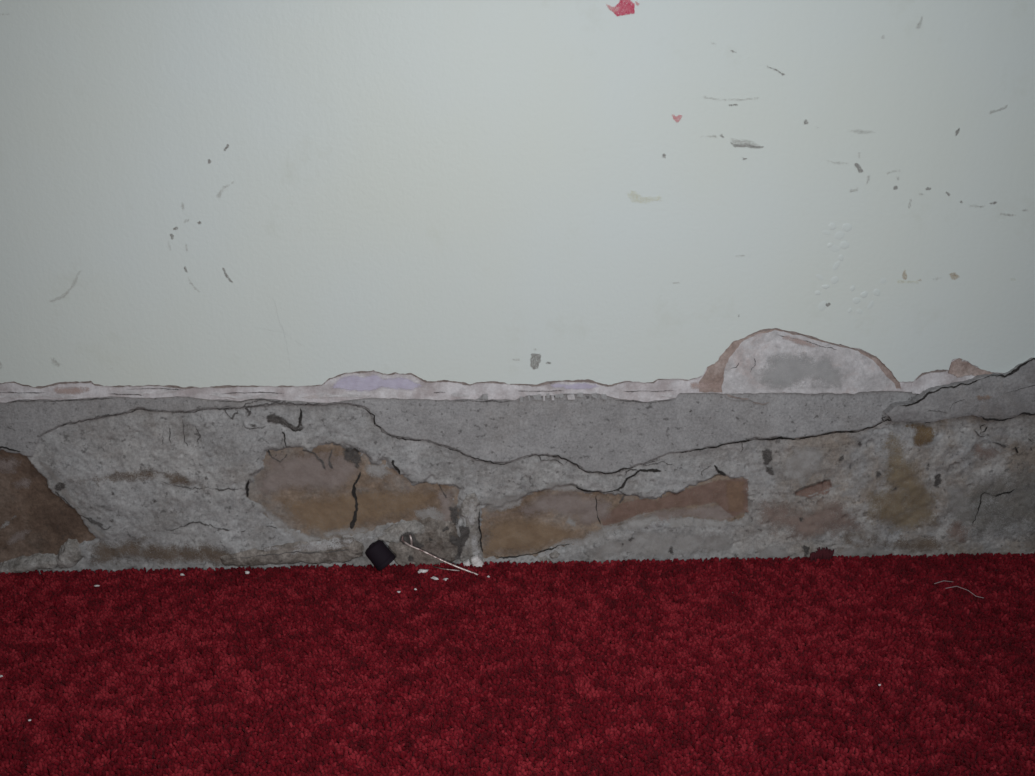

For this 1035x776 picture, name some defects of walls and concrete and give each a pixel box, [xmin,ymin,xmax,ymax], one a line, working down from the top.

flaking render [0,446,105,574]
crack [350,472,361,529]
flaking render [220,443,752,567]
peeling [0,328,1003,432]
crack [41,358,1035,491]
spalling [762,449,775,475]